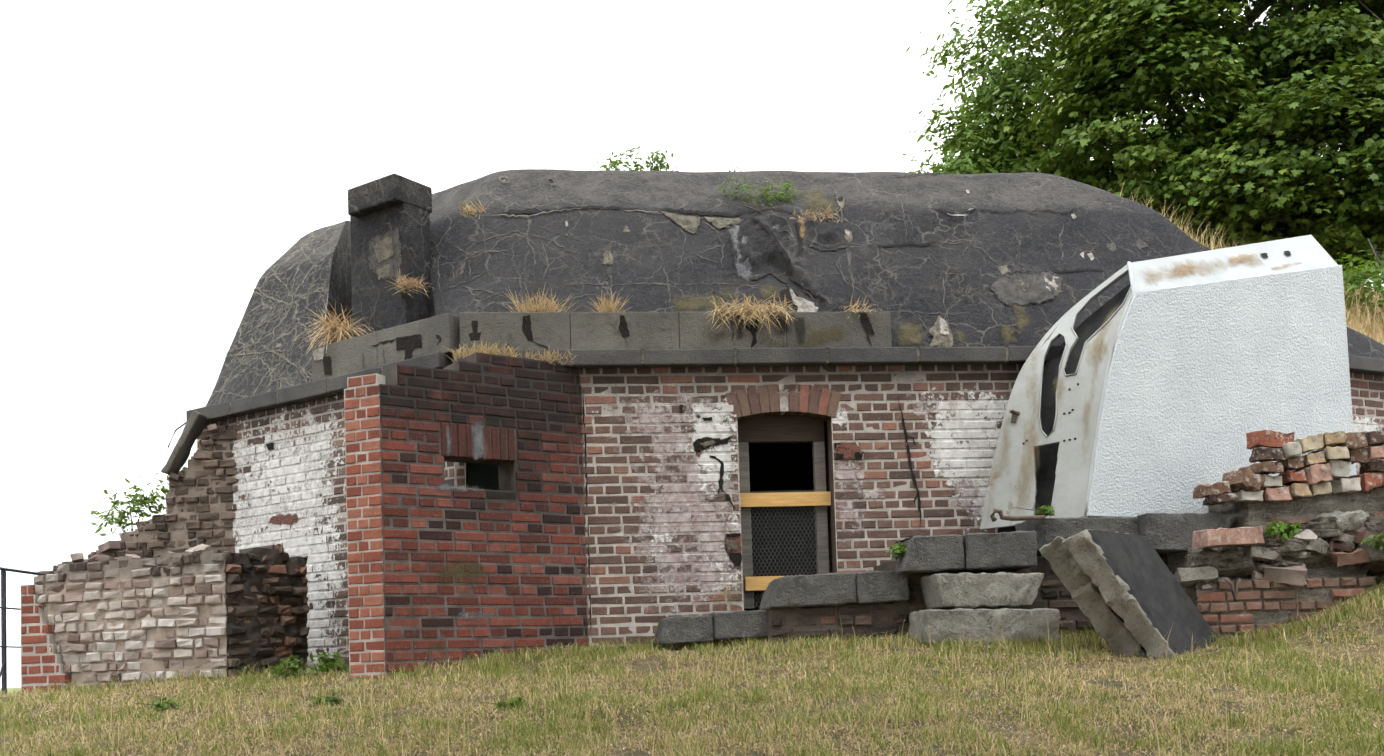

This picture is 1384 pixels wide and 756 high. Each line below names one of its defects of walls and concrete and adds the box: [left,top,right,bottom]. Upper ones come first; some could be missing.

crack [430,172,797,349]
crack [823,172,1124,347]
corrosion [1230,251,1291,269]
crack [225,239,317,386]
spalling [780,288,818,312]
spalling [370,334,422,360]
crack [710,456,735,511]